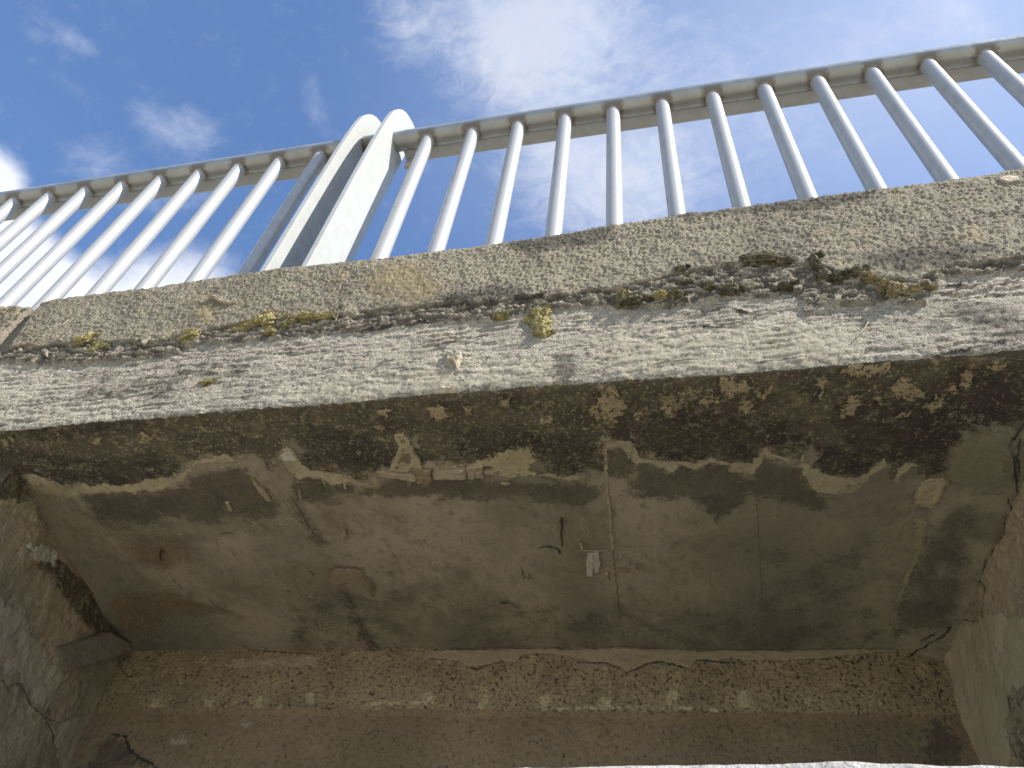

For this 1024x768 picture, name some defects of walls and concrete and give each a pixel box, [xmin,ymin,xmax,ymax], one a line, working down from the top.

peeling [802,282,842,313]
leakage [0,353,1024,638]
crack [836,424,1023,705]
crack [348,595,744,674]
crack [1,679,60,749]